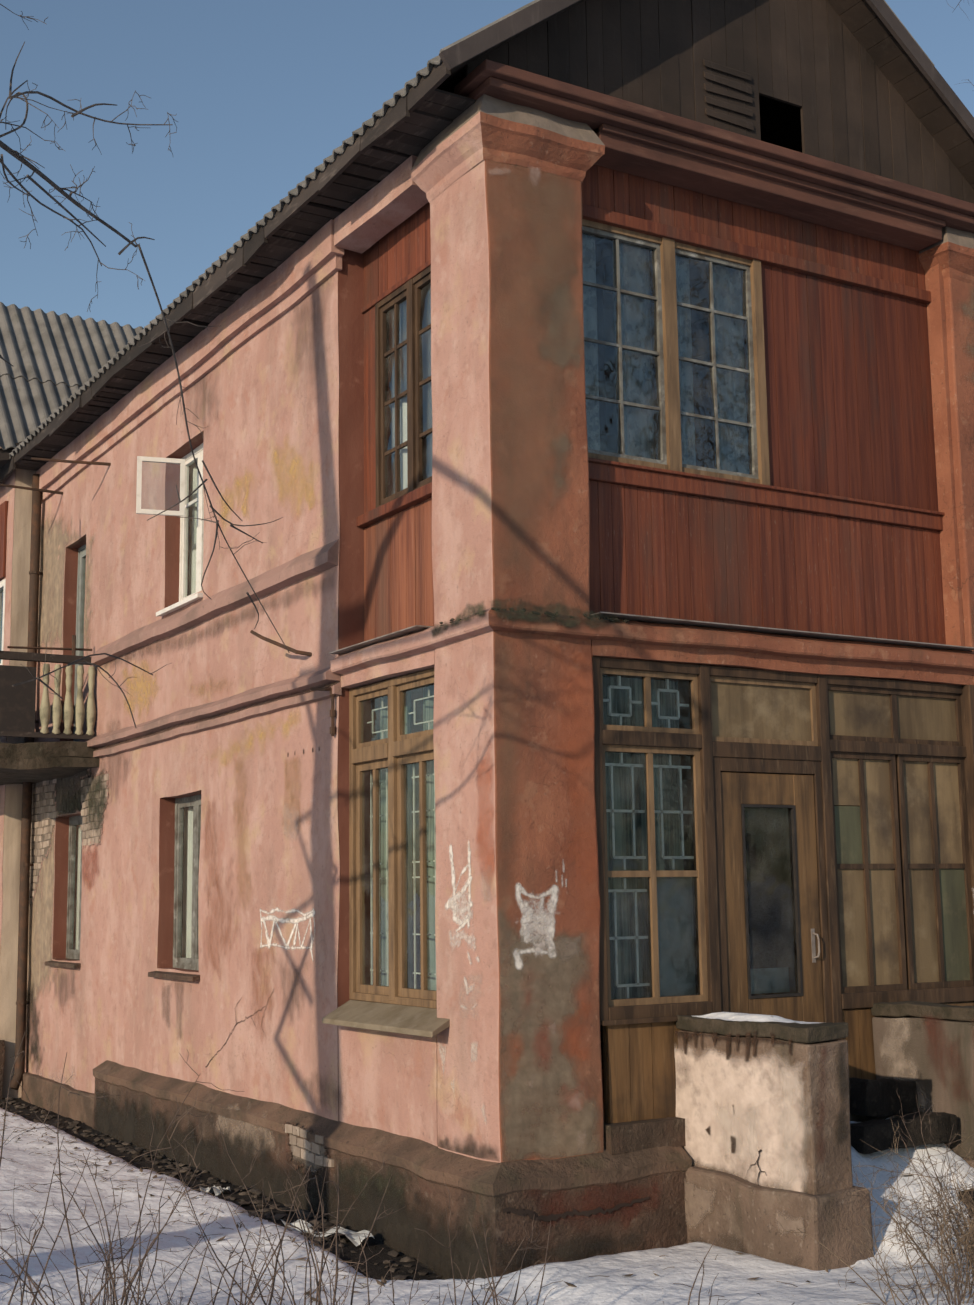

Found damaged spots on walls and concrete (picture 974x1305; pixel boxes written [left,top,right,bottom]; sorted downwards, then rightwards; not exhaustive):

flaking render [29,770,109,904]
crack [205,988,274,1067]
leakage [675,1030,792,1061]
flaking render [217,1108,334,1178]
leakage [94,1091,636,1280]